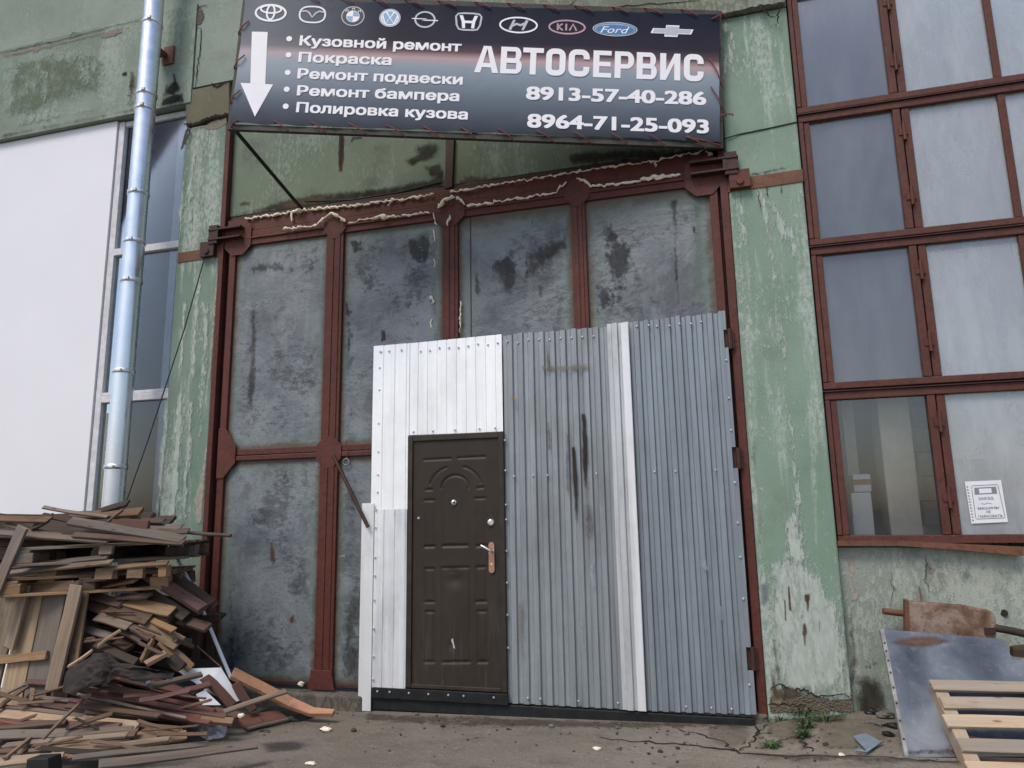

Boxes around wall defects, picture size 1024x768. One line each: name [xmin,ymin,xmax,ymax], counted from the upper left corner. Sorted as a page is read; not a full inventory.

peeling [155,272,218,523]
peeling [178,118,227,233]
peeling [754,188,798,376]
peeling [768,404,882,747]